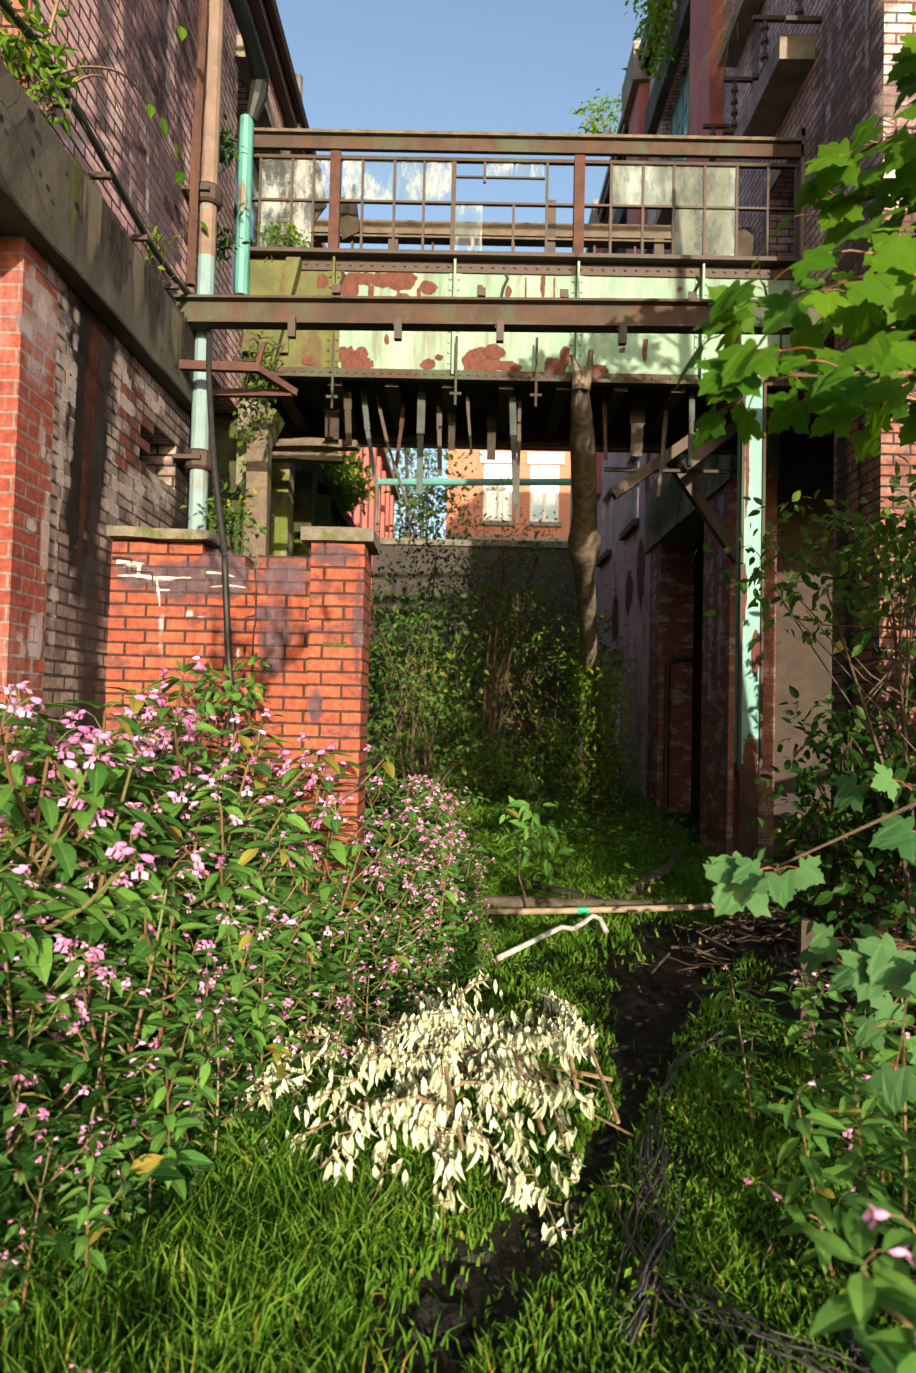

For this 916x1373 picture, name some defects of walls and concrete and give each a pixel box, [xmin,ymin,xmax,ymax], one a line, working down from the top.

leakage [17,265,78,675]
spalling [115,362,154,481]
leakage [117,350,163,429]
leakage [103,432,188,608]
leakage [59,669,106,756]